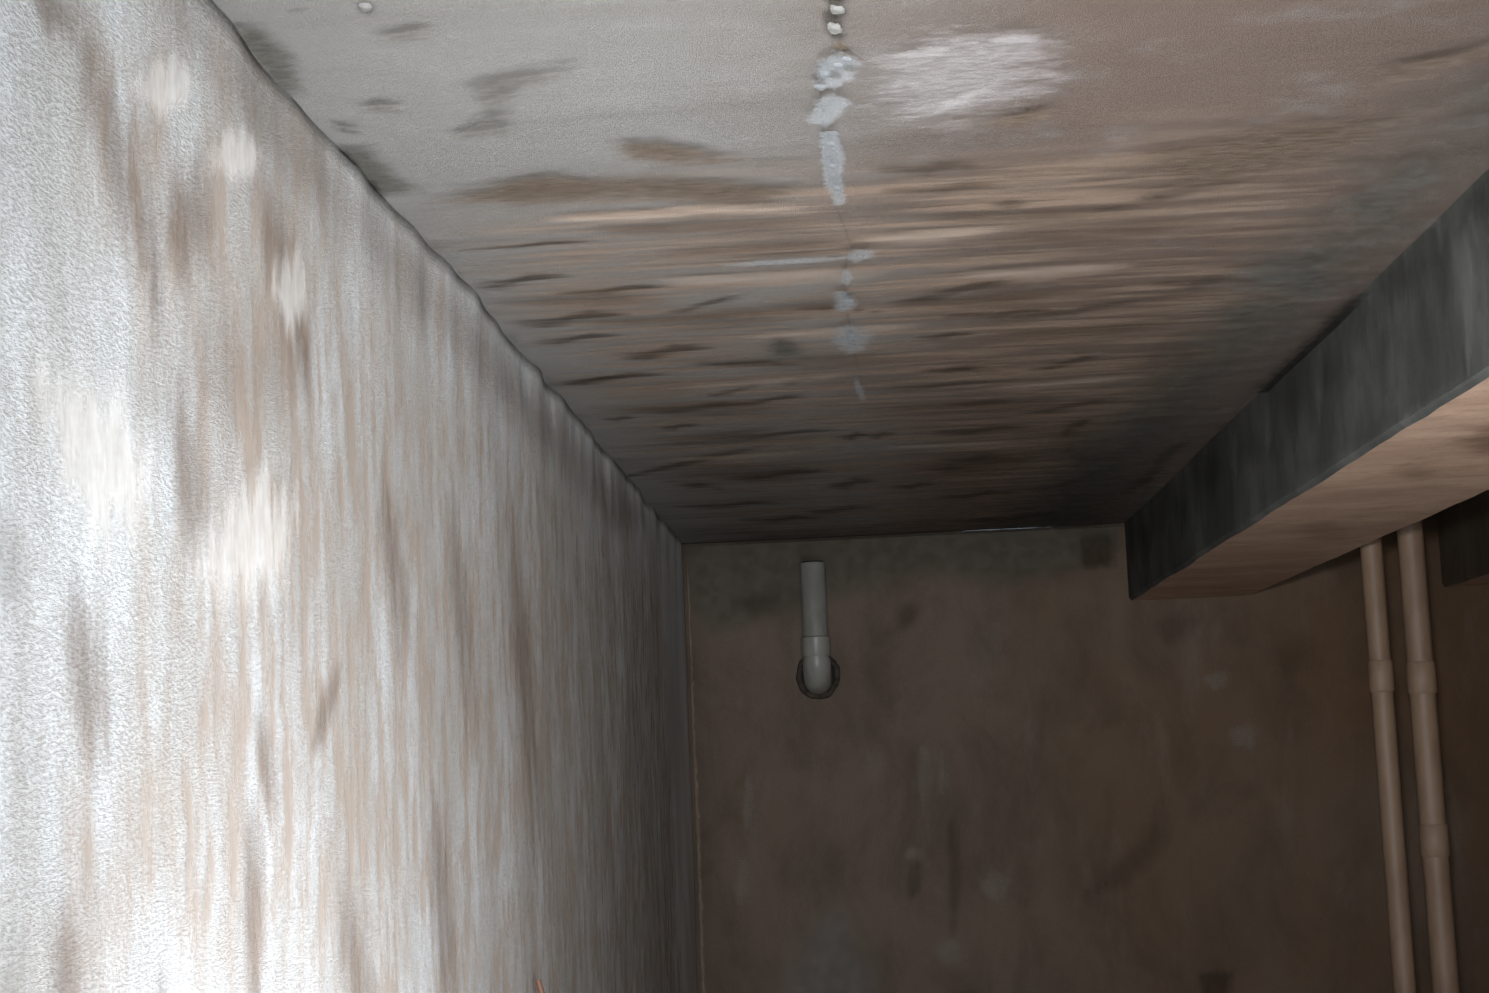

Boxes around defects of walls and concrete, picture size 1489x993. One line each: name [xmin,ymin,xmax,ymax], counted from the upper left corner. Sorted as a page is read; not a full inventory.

leakage [450,56,1379,564]